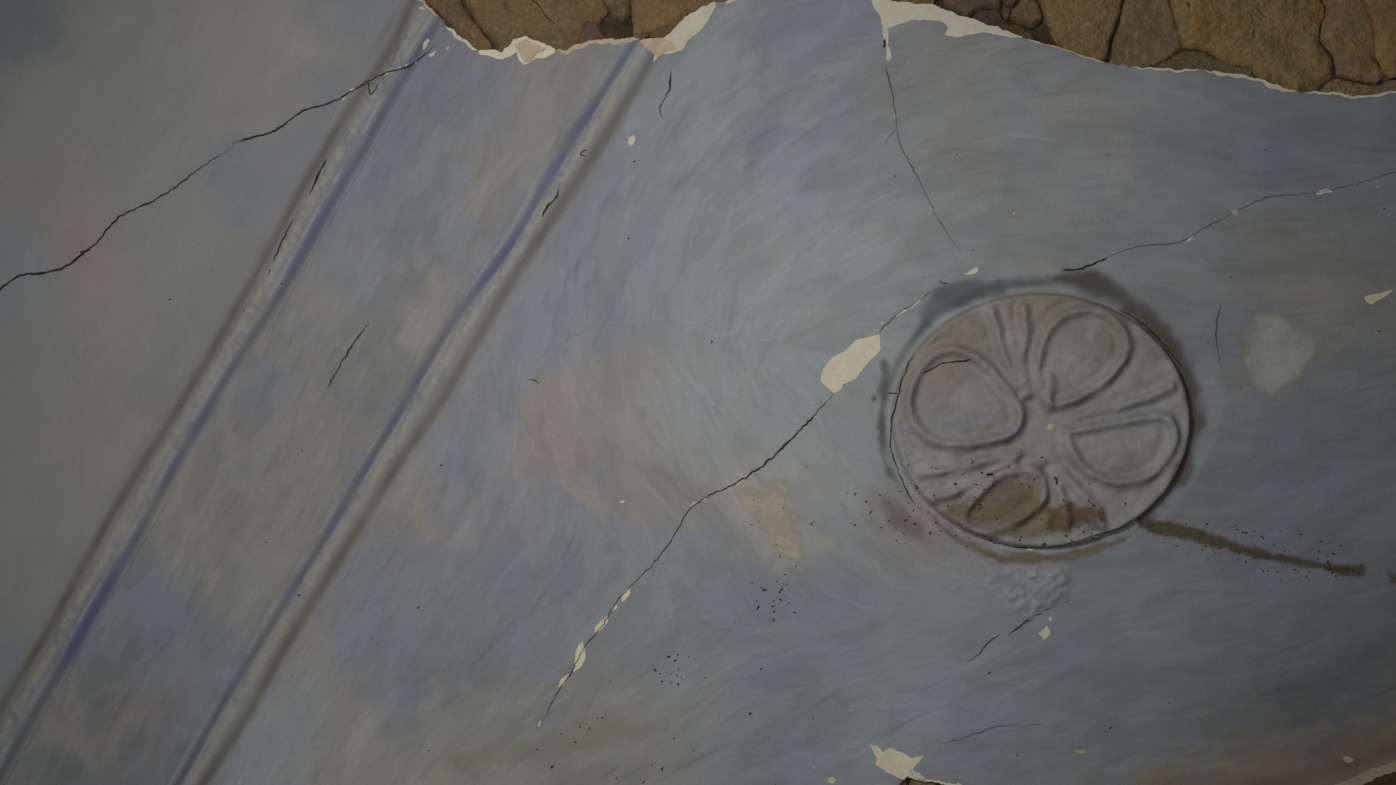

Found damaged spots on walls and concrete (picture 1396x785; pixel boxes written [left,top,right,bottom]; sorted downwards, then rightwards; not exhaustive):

spalling [418,0,736,65]
crack [882,27,892,61]
spalling [872,0,1396,99]
crack [0,7,449,290]
crack [1316,188,1332,196]
crack [1063,257,1108,271]
crack [879,280,948,333]
peeling [820,335,881,393]
spalling [846,460,1095,556]
crack [538,393,834,727]
peeling [870,745,962,785]
peeling [1334,756,1396,785]